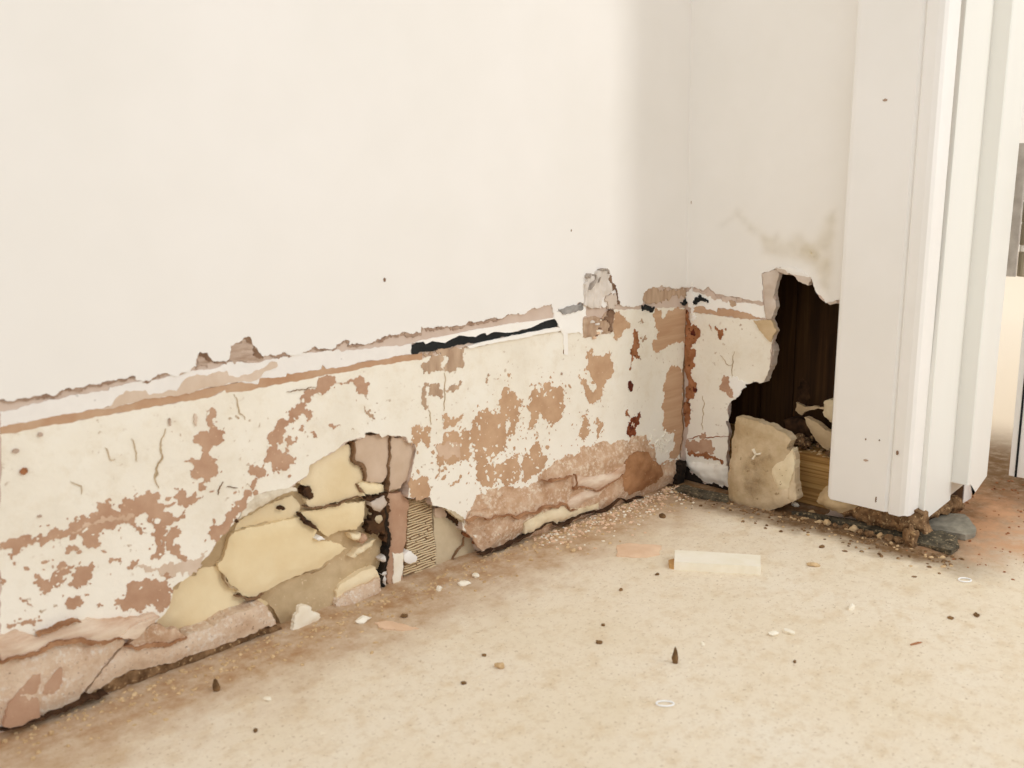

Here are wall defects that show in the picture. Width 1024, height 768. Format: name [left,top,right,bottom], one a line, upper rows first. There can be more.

spalling [613,267,812,398]
flaking render [0,347,729,728]
spalling [788,450,803,502]